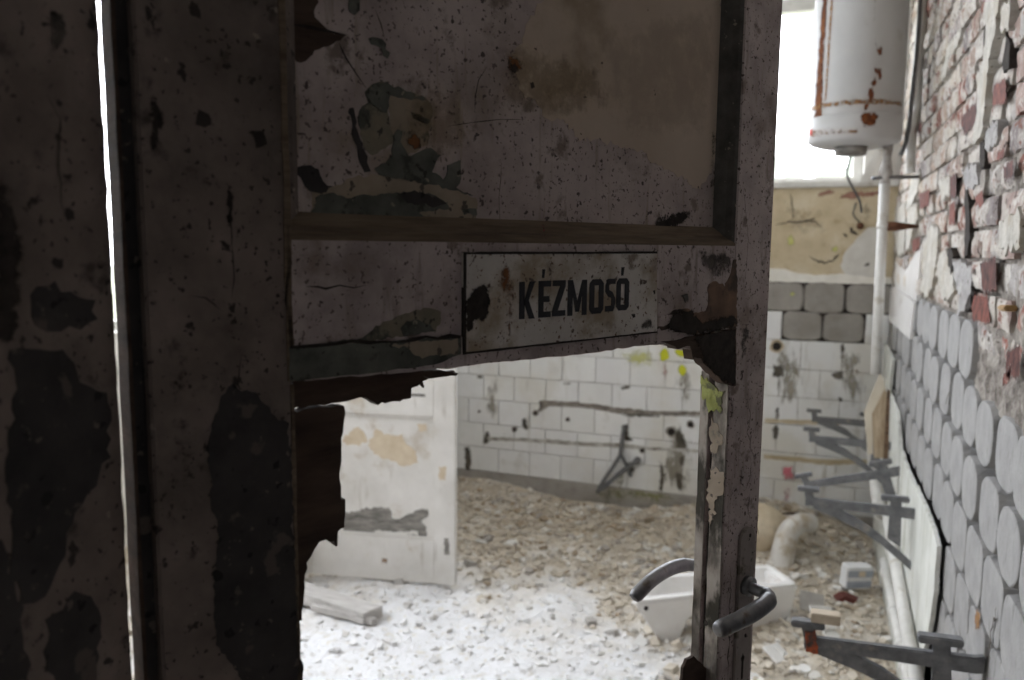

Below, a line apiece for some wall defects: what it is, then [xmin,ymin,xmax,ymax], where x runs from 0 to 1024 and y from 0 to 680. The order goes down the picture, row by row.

peeling [297,81,477,217]
peeling [941,27,968,82]
peeling [962,0,1021,183]
peeling [0,348,112,680]
peeling [206,384,304,680]
peeling [342,427,418,466]
peeling [343,507,429,536]
peeling [706,417,725,525]